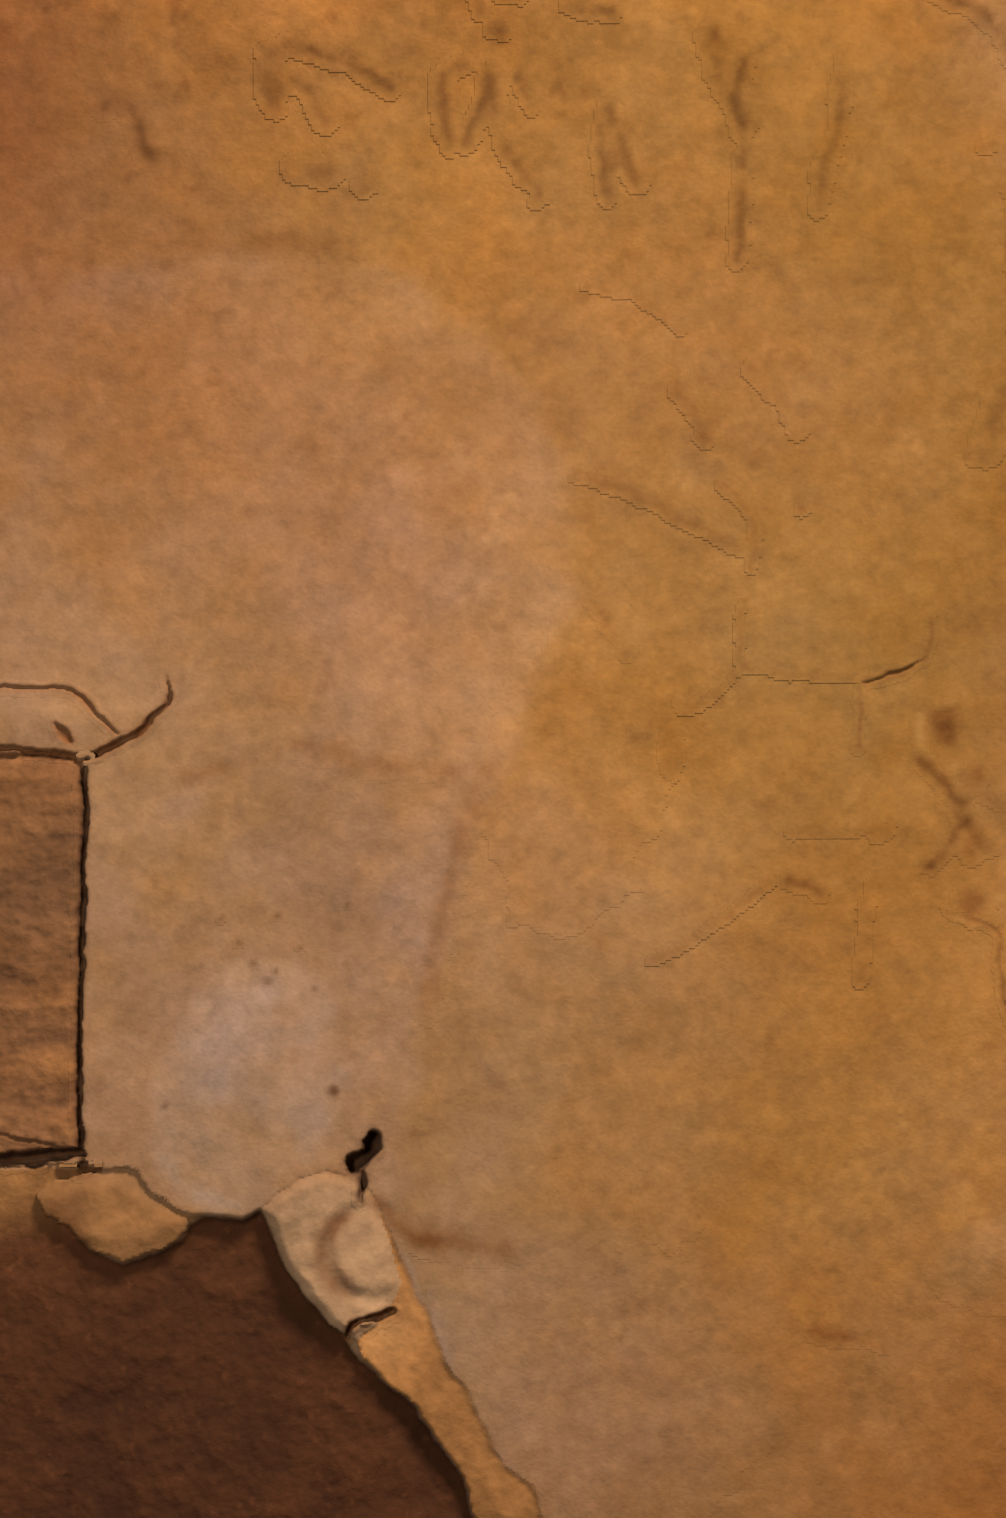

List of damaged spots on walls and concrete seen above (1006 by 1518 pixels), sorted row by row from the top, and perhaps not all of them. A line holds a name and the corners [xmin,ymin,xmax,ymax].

crack [939,903,1006,1029]
spalling [323,1081,344,1102]
flaking render [0,1123,550,1518]